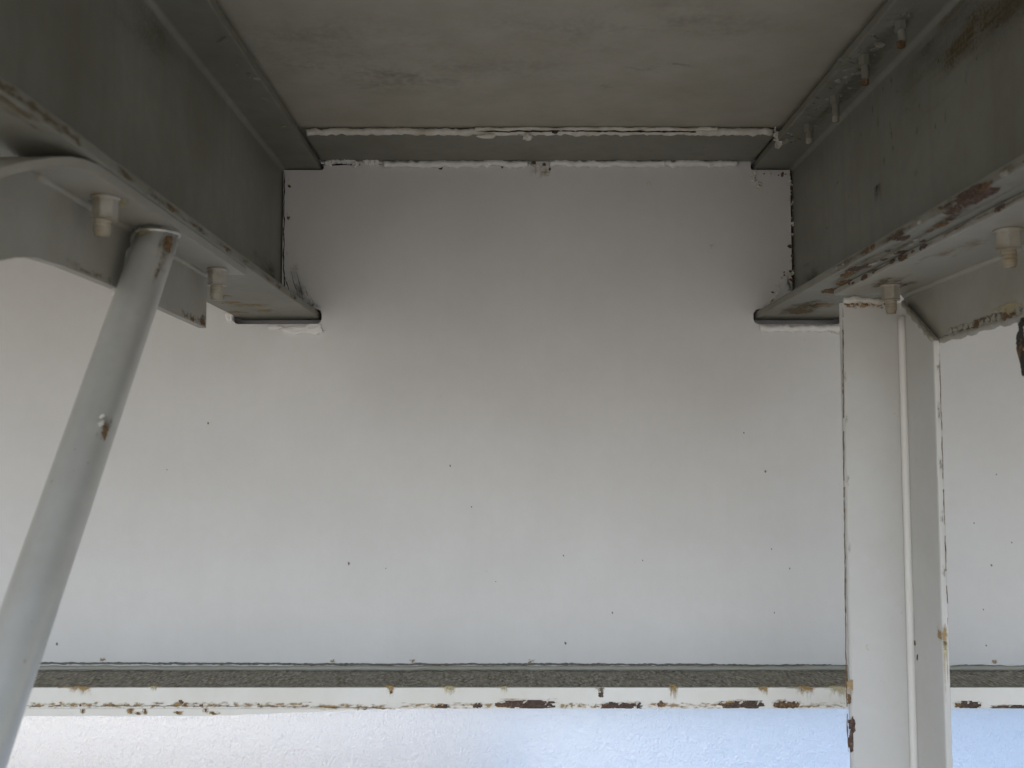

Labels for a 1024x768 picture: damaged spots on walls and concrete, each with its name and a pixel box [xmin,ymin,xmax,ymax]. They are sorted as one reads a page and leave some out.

rust [949,182,1001,208]
rust [786,279,852,314]
rust [948,303,1024,376]
rust [98,414,109,441]
rust [705,431,856,752]
rust [938,628,948,666]
rust [27,700,385,715]
rust [403,686,691,709]